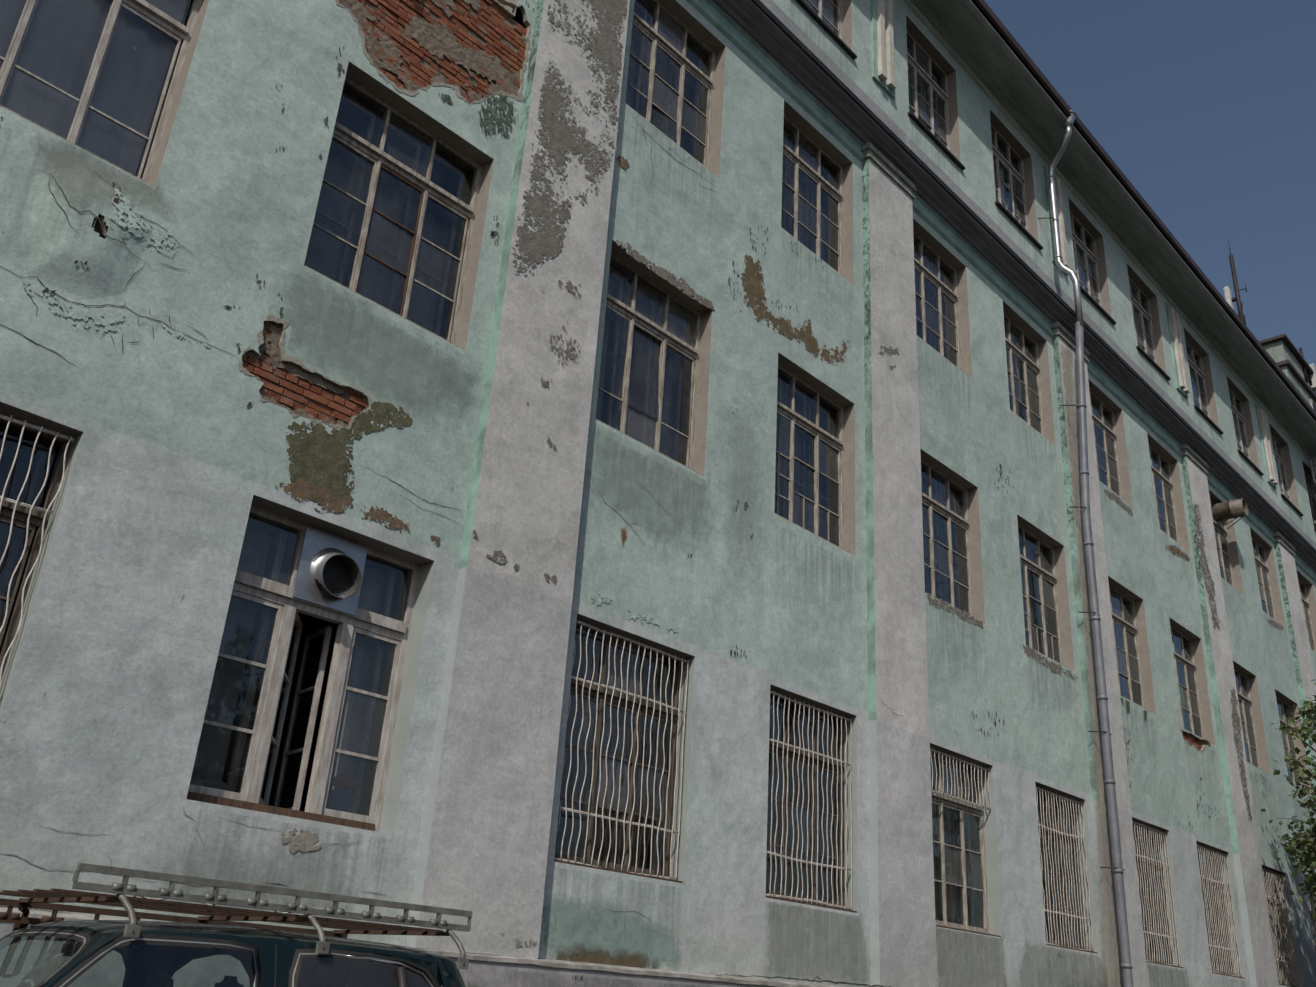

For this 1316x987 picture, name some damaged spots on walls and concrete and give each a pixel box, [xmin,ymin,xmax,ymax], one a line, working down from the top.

flaking render [335,0,629,293]
crack [0,170,239,367]
flaking render [236,274,412,533]
peeling [550,321,580,367]
peeling [728,227,851,366]